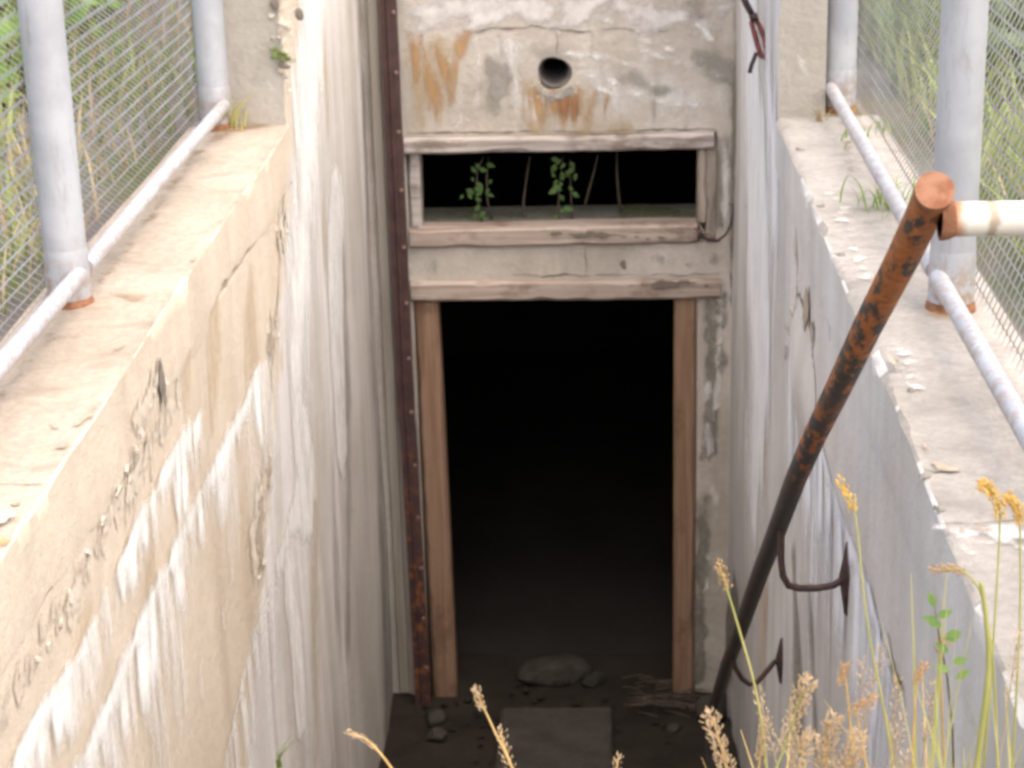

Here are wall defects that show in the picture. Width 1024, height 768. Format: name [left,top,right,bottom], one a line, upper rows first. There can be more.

rust [411,33,469,116]
rust [525,85,588,135]
water stain [703,293,728,458]
crack [794,282,830,341]
spalling [0,358,181,735]
water stain [693,497,710,684]